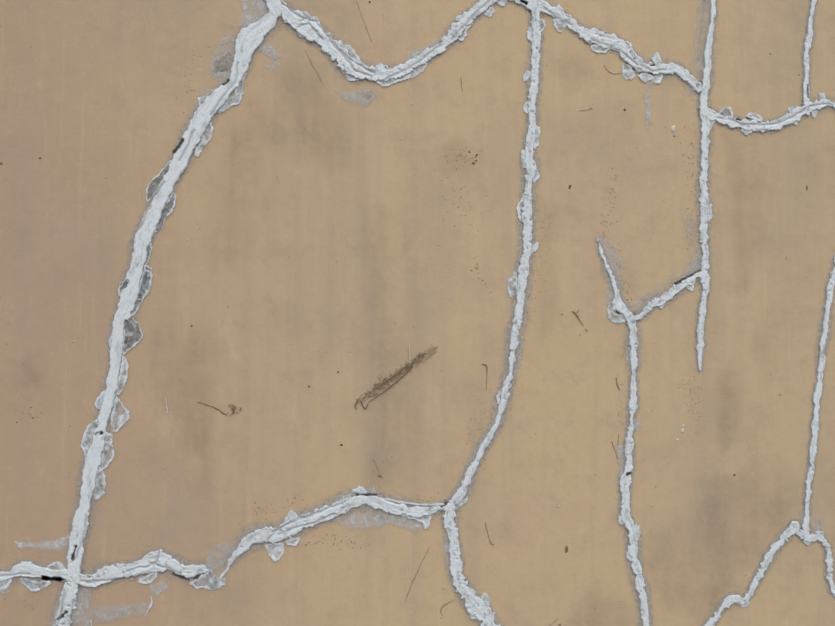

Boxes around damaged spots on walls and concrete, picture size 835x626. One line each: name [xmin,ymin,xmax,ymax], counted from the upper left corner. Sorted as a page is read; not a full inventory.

crack [0,0,546,626]
crack [270,0,835,626]